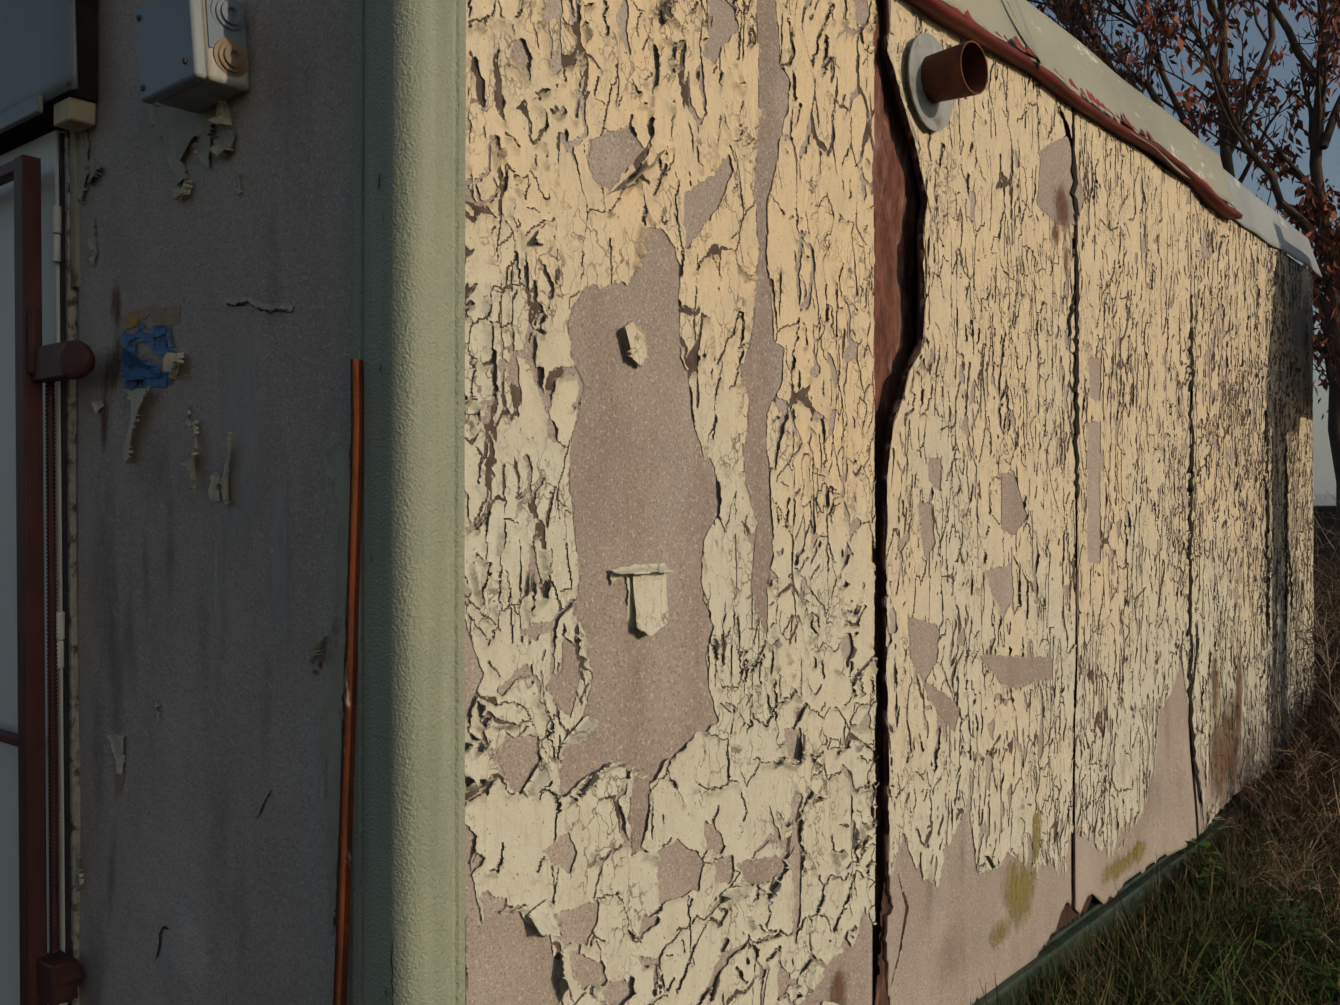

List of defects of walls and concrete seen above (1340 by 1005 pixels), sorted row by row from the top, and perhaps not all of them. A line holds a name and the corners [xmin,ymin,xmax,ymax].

peeling [119,304,184,464]
peeling [146,97,235,201]
peeling [305,442,350,937]
peeling [465,0,1316,1005]
crack [1068,108,1080,519]
crack [1188,292,1204,824]